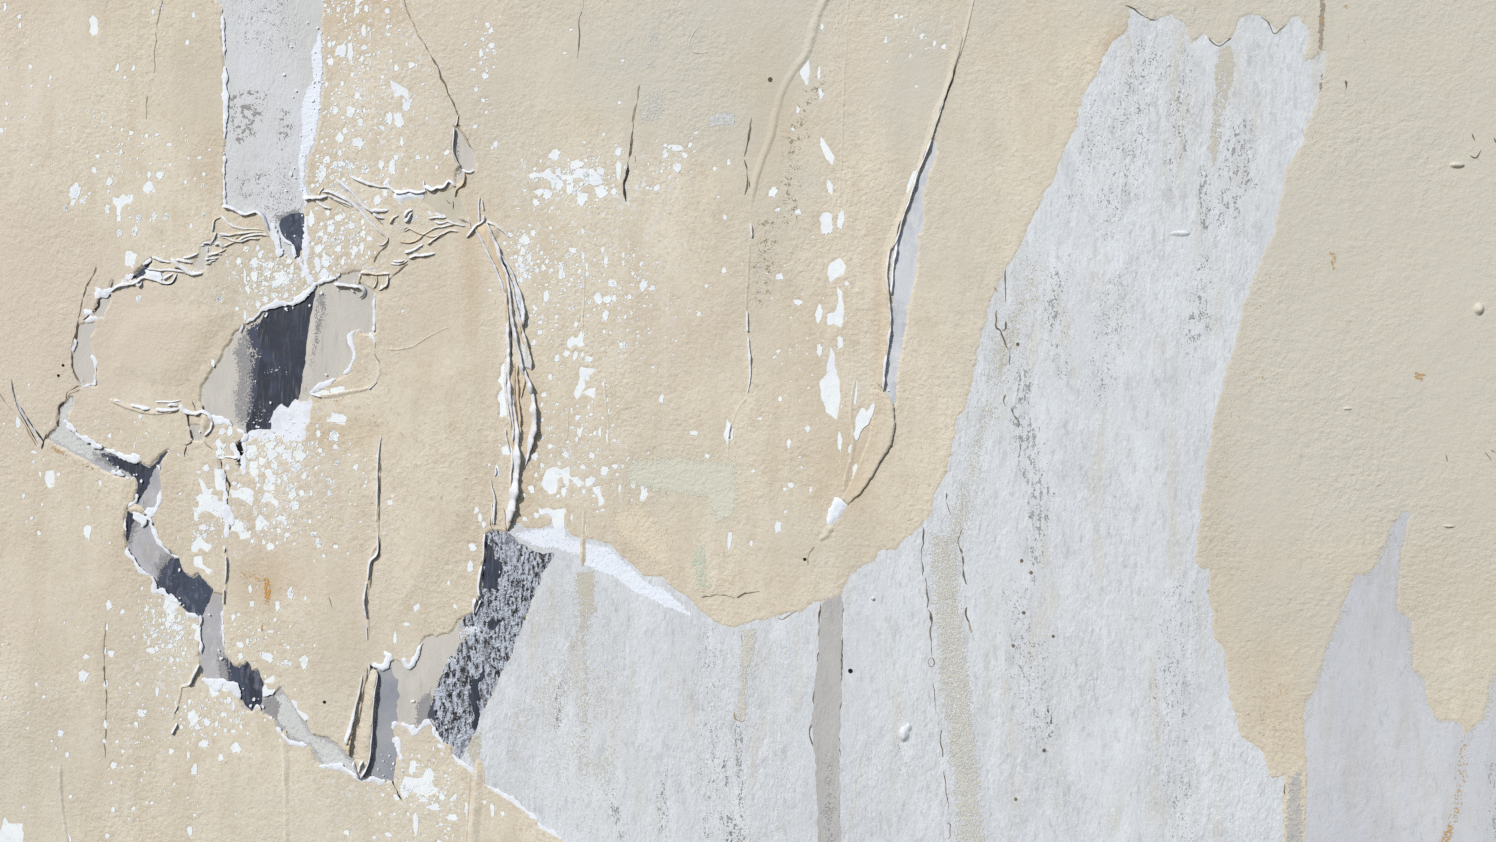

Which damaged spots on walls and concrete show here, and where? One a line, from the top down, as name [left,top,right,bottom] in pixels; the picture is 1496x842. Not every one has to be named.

peeling [0,0,827,842]
crack [404,0,459,126]
crack [623,86,640,201]
peeling [748,137,937,501]
peeling [839,8,1326,842]
peeling [1303,512,1496,842]